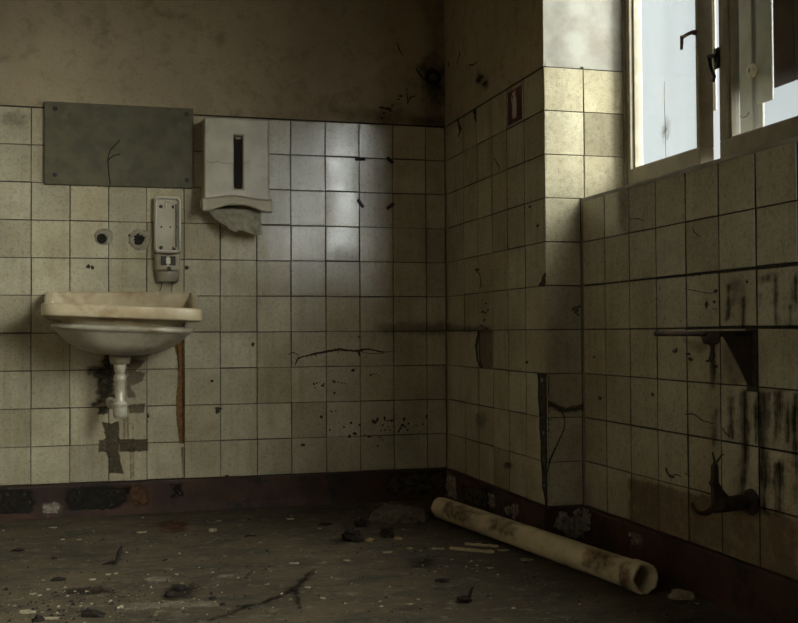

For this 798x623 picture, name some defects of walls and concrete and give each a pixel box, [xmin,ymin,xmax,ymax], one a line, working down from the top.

crack [288,348,395,365]
spalling [475,302,495,369]
rust [175,339,185,462]
spalling [538,373,549,498]
peeling [0,485,130,517]
damp [629,390,798,579]
crack [210,570,314,620]